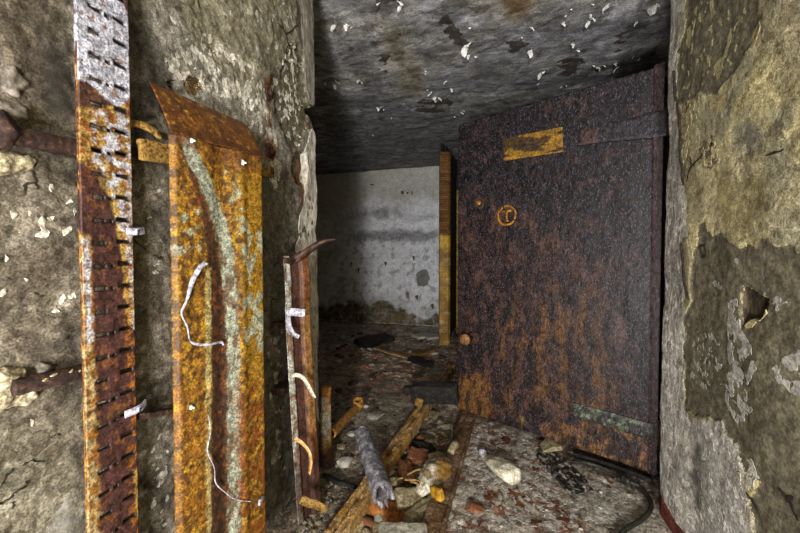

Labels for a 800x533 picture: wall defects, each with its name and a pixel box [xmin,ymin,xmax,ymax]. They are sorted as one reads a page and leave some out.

crack [277,18,298,53]
peeling [438,15,477,60]
peeling [505,37,533,59]
peeling [415,81,454,113]
spalling [660,0,800,533]
damp [318,301,439,326]